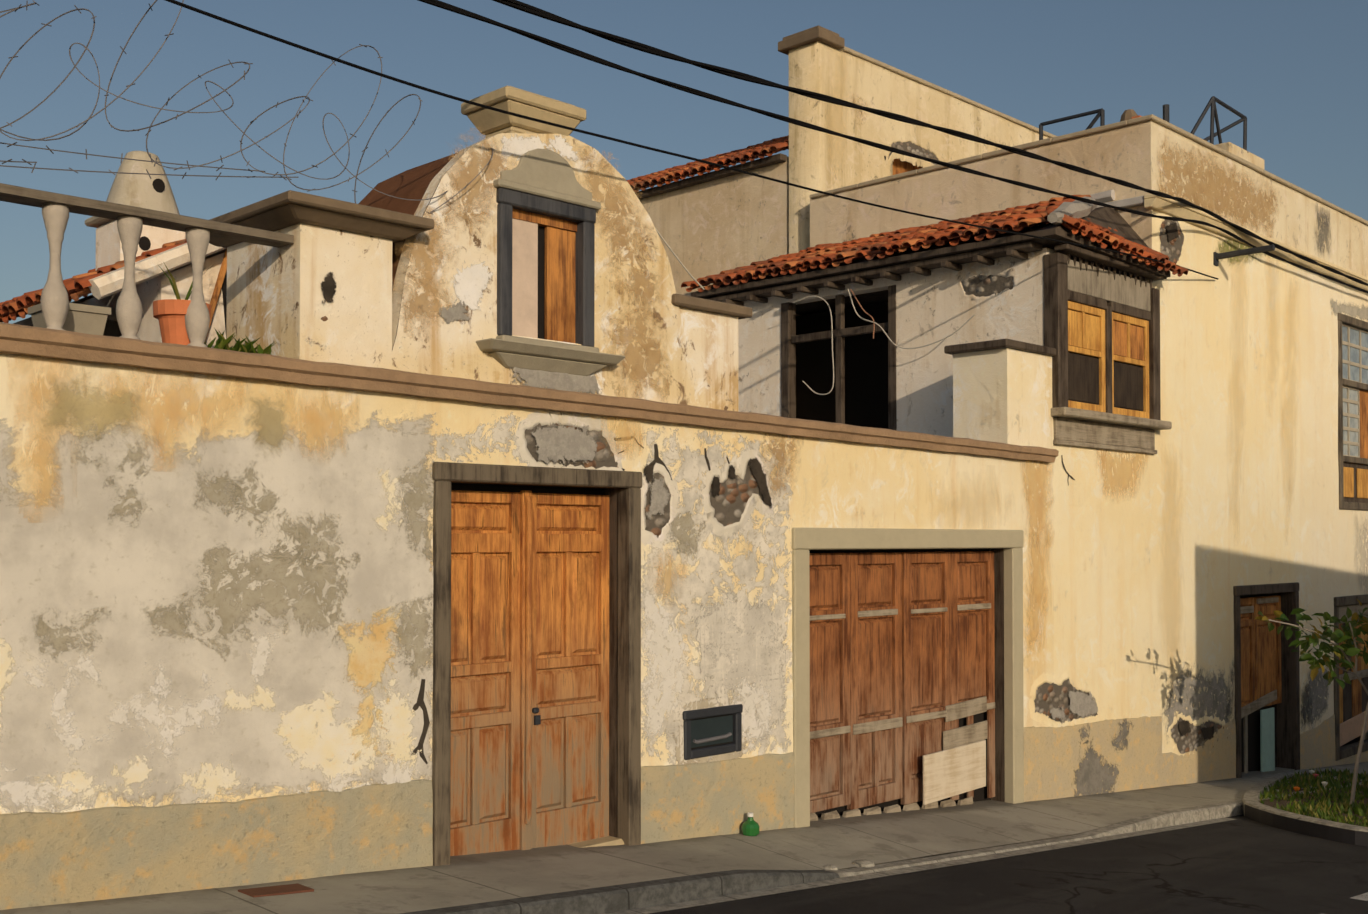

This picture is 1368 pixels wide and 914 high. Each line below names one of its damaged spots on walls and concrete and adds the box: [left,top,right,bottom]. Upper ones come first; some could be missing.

water stain [1317,211,1331,252]
spalling [314,272,336,321]
spalling [958,270,1019,303]
water stain [1331,300,1368,320]
water stain [255,401,283,447]
water stain [109,447,150,519]
water stain [36,608,111,658]
water stain [144,465,434,759]
peeling [0,411,623,814]
peeling [640,427,792,765]
spalling [1029,669,1134,797]
spalling [1166,711,1230,756]